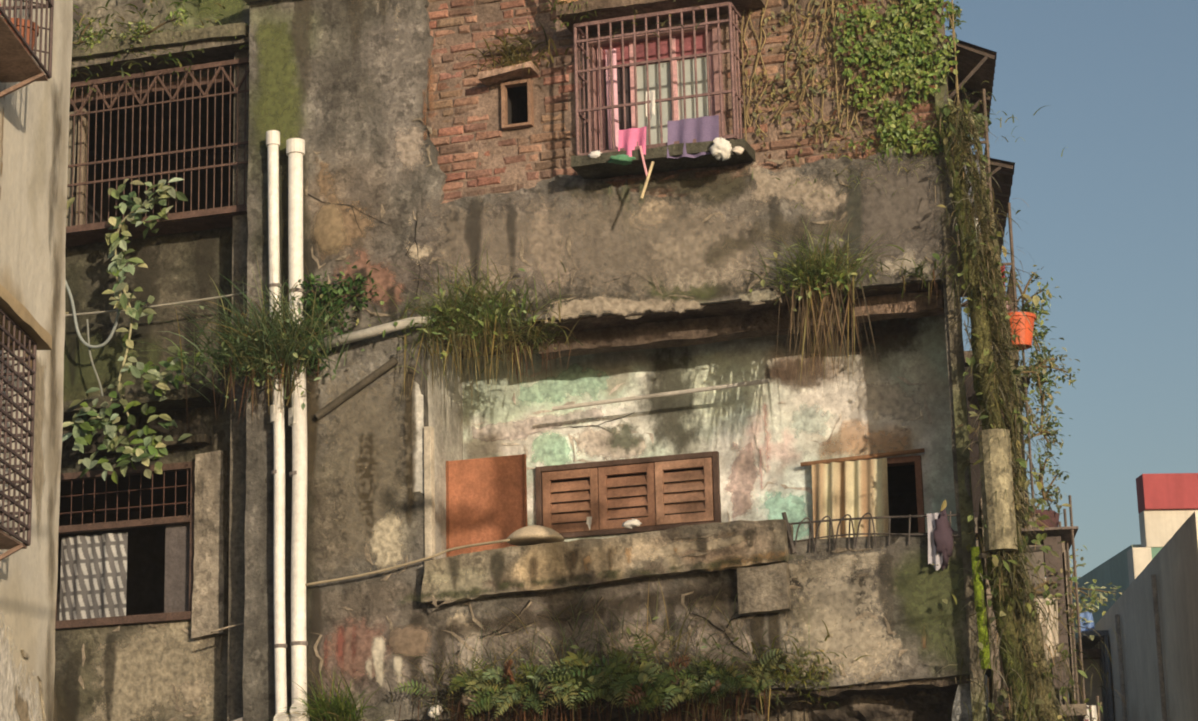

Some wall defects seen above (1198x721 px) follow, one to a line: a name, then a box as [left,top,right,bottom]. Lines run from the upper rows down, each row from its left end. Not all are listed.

leakage [292,0,310,90]
leakage [50,90,61,221]
flaking render [394,0,949,323]
leakage [607,354,698,453]
peeling [793,376,932,447]
flaking render [0,617,46,721]
leakage [48,642,79,721]
leakage [105,636,115,721]